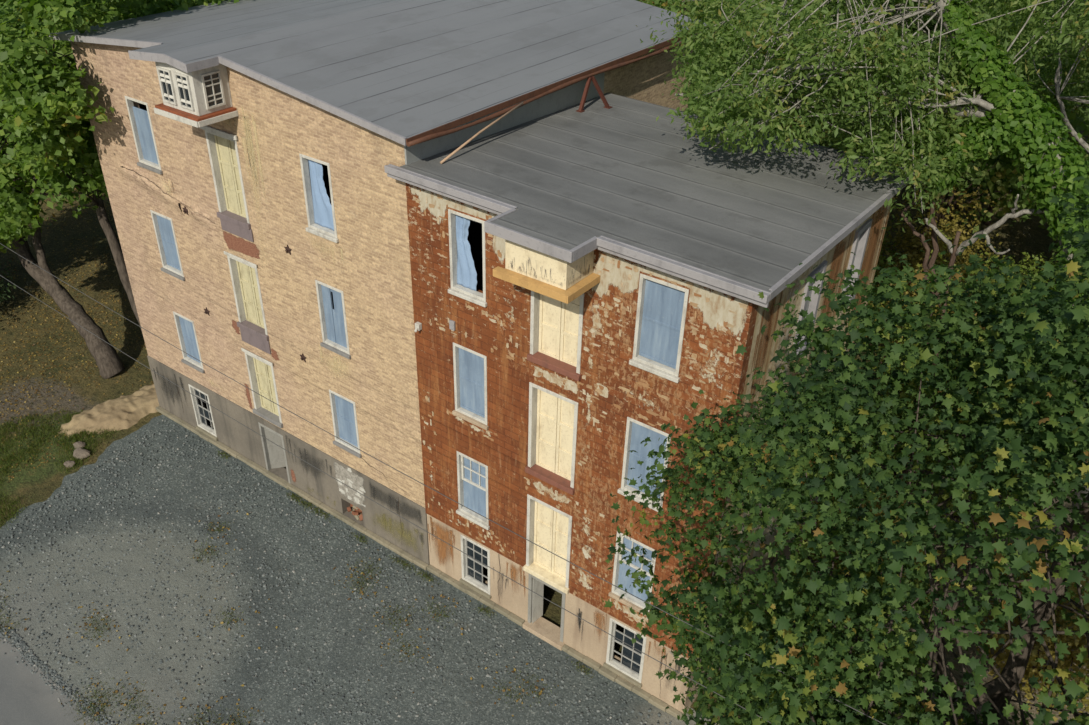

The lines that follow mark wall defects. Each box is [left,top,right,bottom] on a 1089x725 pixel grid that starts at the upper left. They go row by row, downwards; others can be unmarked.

peeling [408,184,505,261]
peeling [465,252,748,466]
peeling [334,462,366,507]
water stain [371,488,422,539]
peeling [422,392,514,558]
peeling [524,477,611,597]
peeling [604,598,648,628]